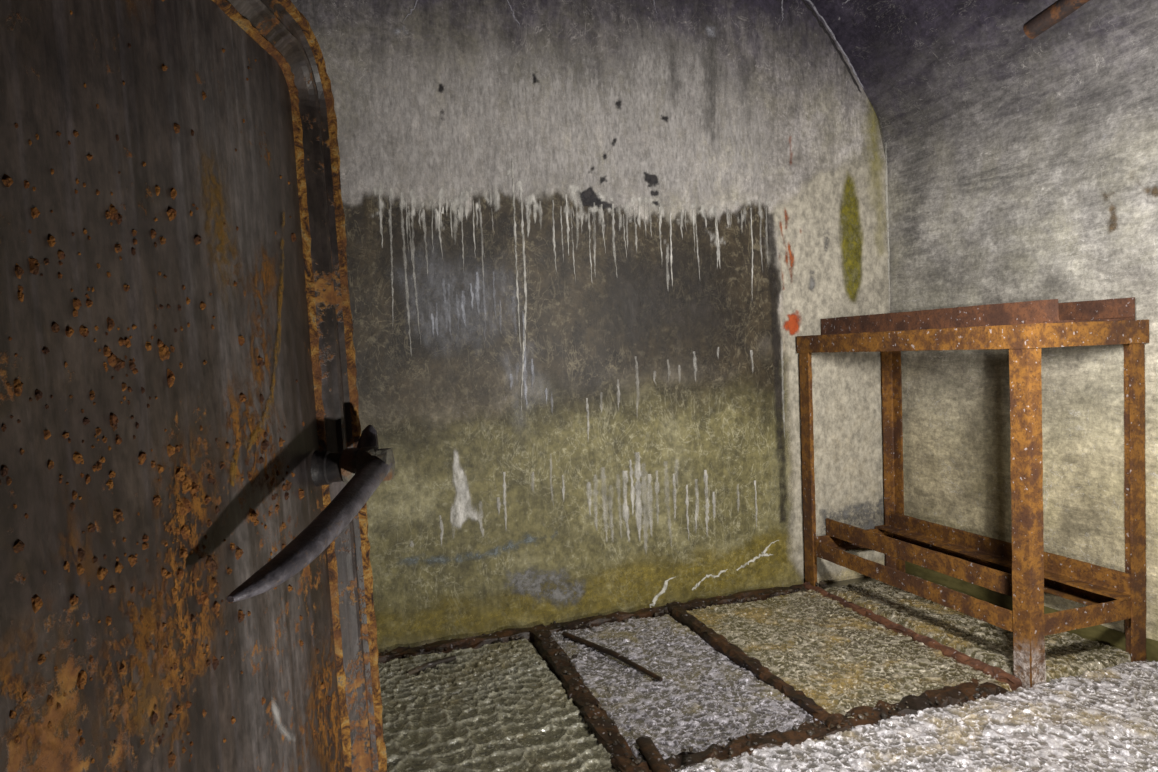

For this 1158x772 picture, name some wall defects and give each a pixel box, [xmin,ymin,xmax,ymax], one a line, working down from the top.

crack [781,0,863,92]
rust [75,178,199,260]
rust [15,234,81,302]
rust [43,255,304,769]
damp [343,192,1158,772]
crack [650,540,778,608]
rust [299,640,344,772]